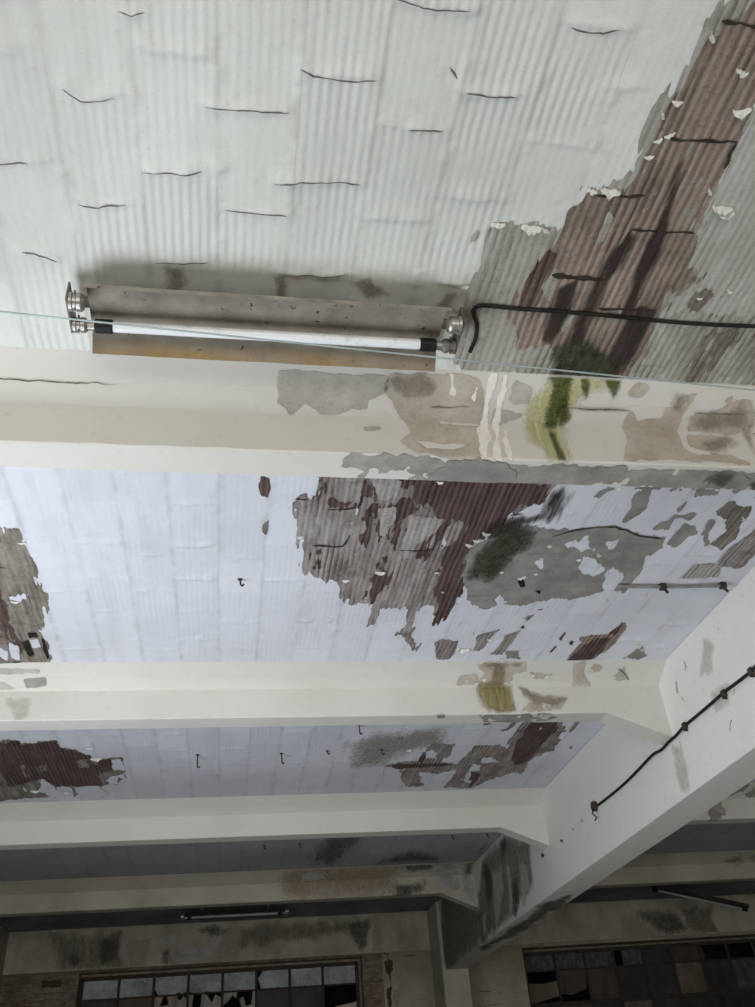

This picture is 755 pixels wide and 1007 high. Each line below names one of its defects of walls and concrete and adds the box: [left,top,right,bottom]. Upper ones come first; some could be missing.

crack [206,106,288,114]
crack [274,180,356,188]
crack [80,203,125,211]
crack [225,209,286,217]
crack [0,377,117,385]
peeling [277,0,755,789]
crack [577,405,628,413]
leakage [471,373,532,461]
peeling [0,527,53,690]
peeling [0,739,126,802]
leakage [288,838,570,966]